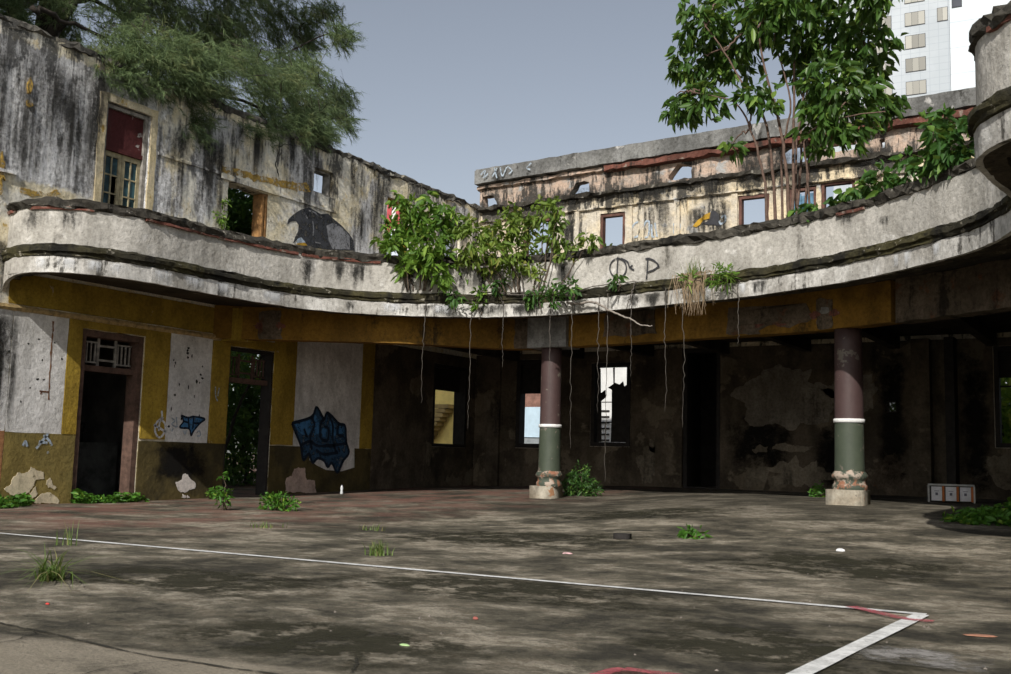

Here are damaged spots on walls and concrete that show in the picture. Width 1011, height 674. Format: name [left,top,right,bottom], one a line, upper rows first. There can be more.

leakage [0,54,109,172]
leakage [254,132,263,172]
leakage [201,142,224,221]
leakage [355,176,390,236]
leakage [622,182,668,227]
leakage [689,203,727,232]
leakage [0,320,17,407]
peeling [730,364,834,431]
peeling [4,467,59,504]
peeling [176,473,196,498]
peeling [285,467,316,493]
peeling [745,443,834,490]